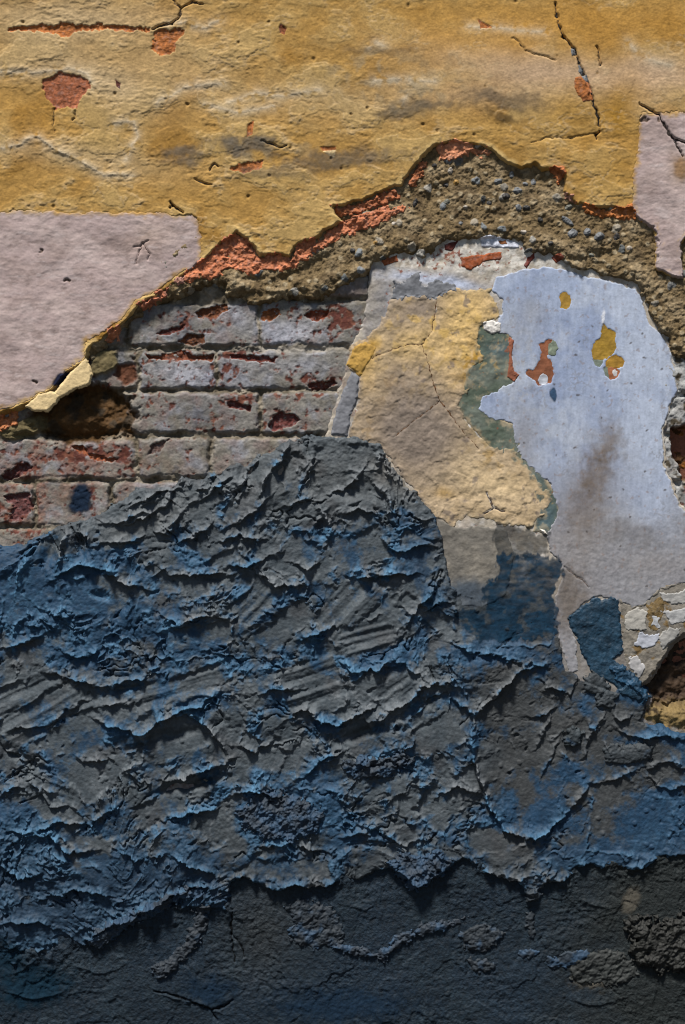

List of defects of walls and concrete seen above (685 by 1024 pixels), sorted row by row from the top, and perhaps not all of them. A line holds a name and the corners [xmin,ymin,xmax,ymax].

spalling [8,22,185,56]
crack [152,0,203,30]
flaking render [42,71,91,110]
crack [513,3,601,143]
crack [640,104,685,157]
flaking render [0,138,685,535]